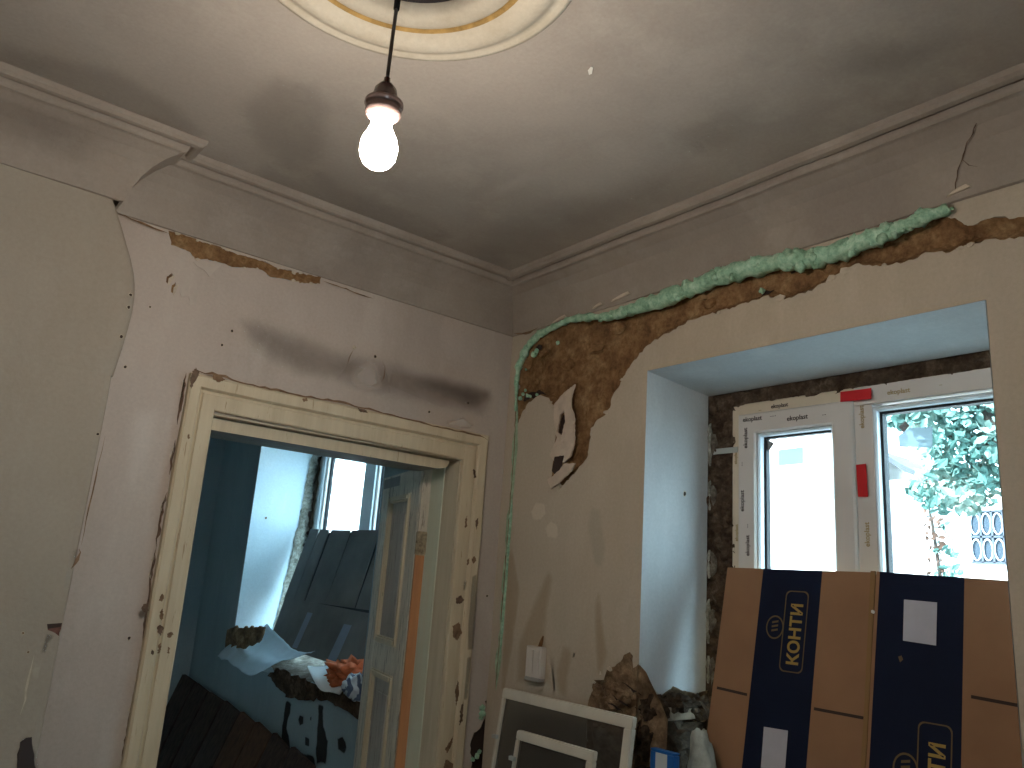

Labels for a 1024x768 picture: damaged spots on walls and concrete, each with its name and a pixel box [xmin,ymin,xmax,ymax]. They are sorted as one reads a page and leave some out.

flaking render [169,231,321,285]
flaking render [517,217,1024,489]
crack [955,123,977,189]
flaking render [588,397,736,768]